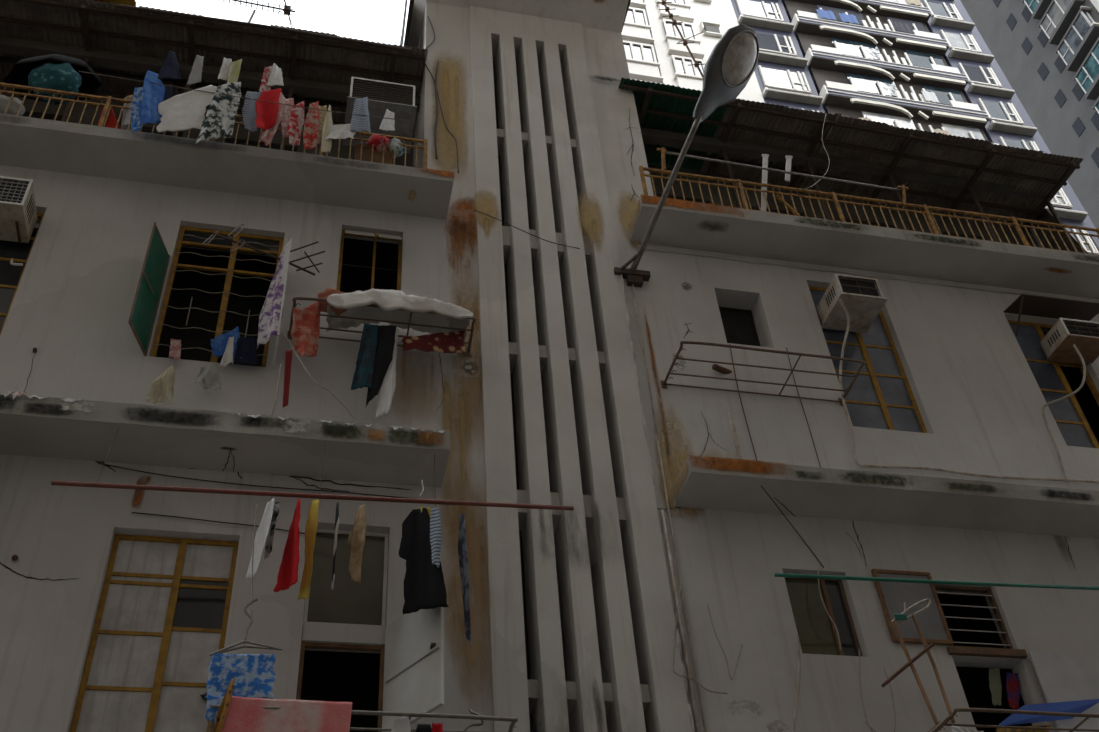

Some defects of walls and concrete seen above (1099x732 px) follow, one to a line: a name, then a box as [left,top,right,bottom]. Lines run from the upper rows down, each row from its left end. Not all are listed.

rust [448,200,477,269]
water stain [0,396,13,408]
water stain [26,404,68,415]
water stain [128,408,210,426]
water stain [242,417,267,426]
rust [693,455,779,474]